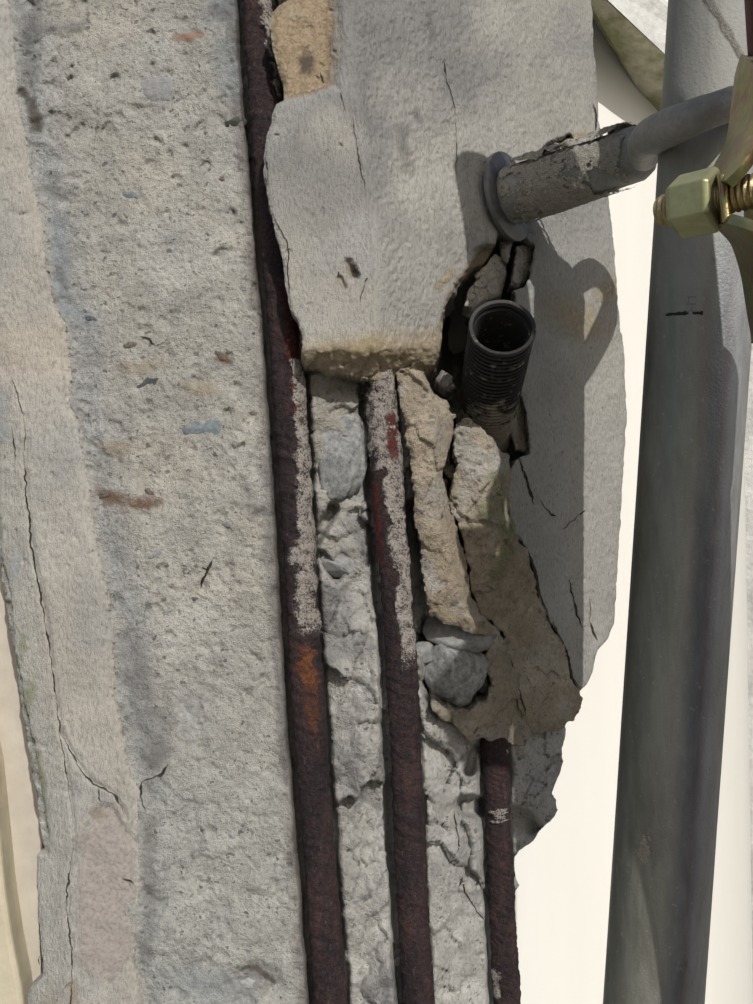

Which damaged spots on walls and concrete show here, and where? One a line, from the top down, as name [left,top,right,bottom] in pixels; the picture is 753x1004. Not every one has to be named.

flaking render [259,0,333,99]
corrosion [285,292,303,412]
corrosion [386,413,399,458]
flaking render [288,337,433,665]
crack [519,460,585,530]
crack [518,536,598,688]
crack [11,376,168,1004]
corrosion [295,650,318,685]
peeling [488,808,509,823]
peeling [491,969,501,999]